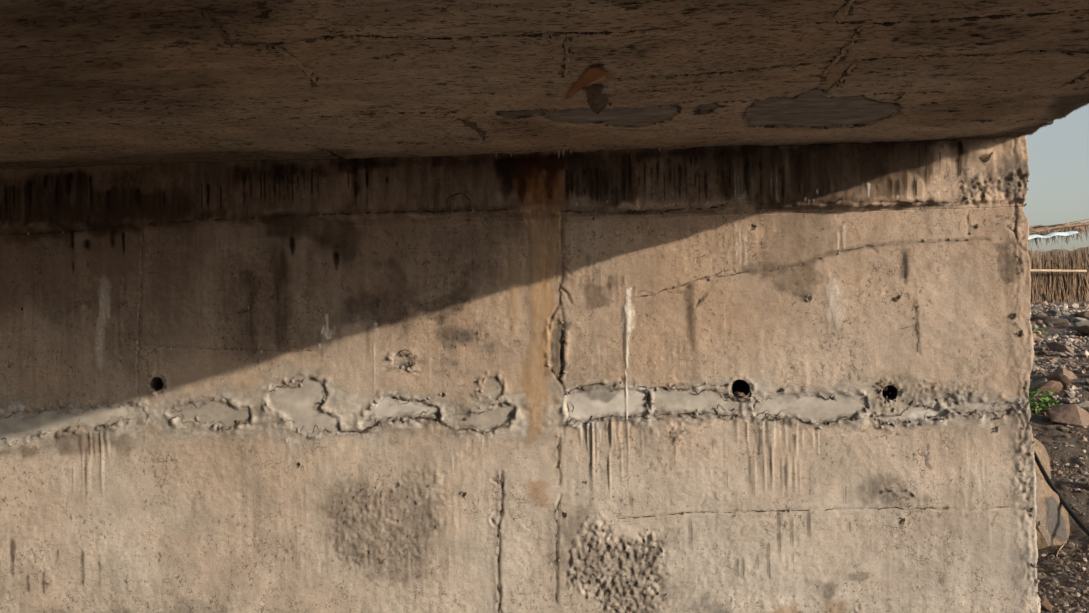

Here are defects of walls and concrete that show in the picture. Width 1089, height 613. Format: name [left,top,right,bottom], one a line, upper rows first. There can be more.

crack [791,9,1089,27]
spalling [487,103,727,138]
spalling [742,88,902,129]
water stain [0,172,222,253]
crack [9,197,1030,613]